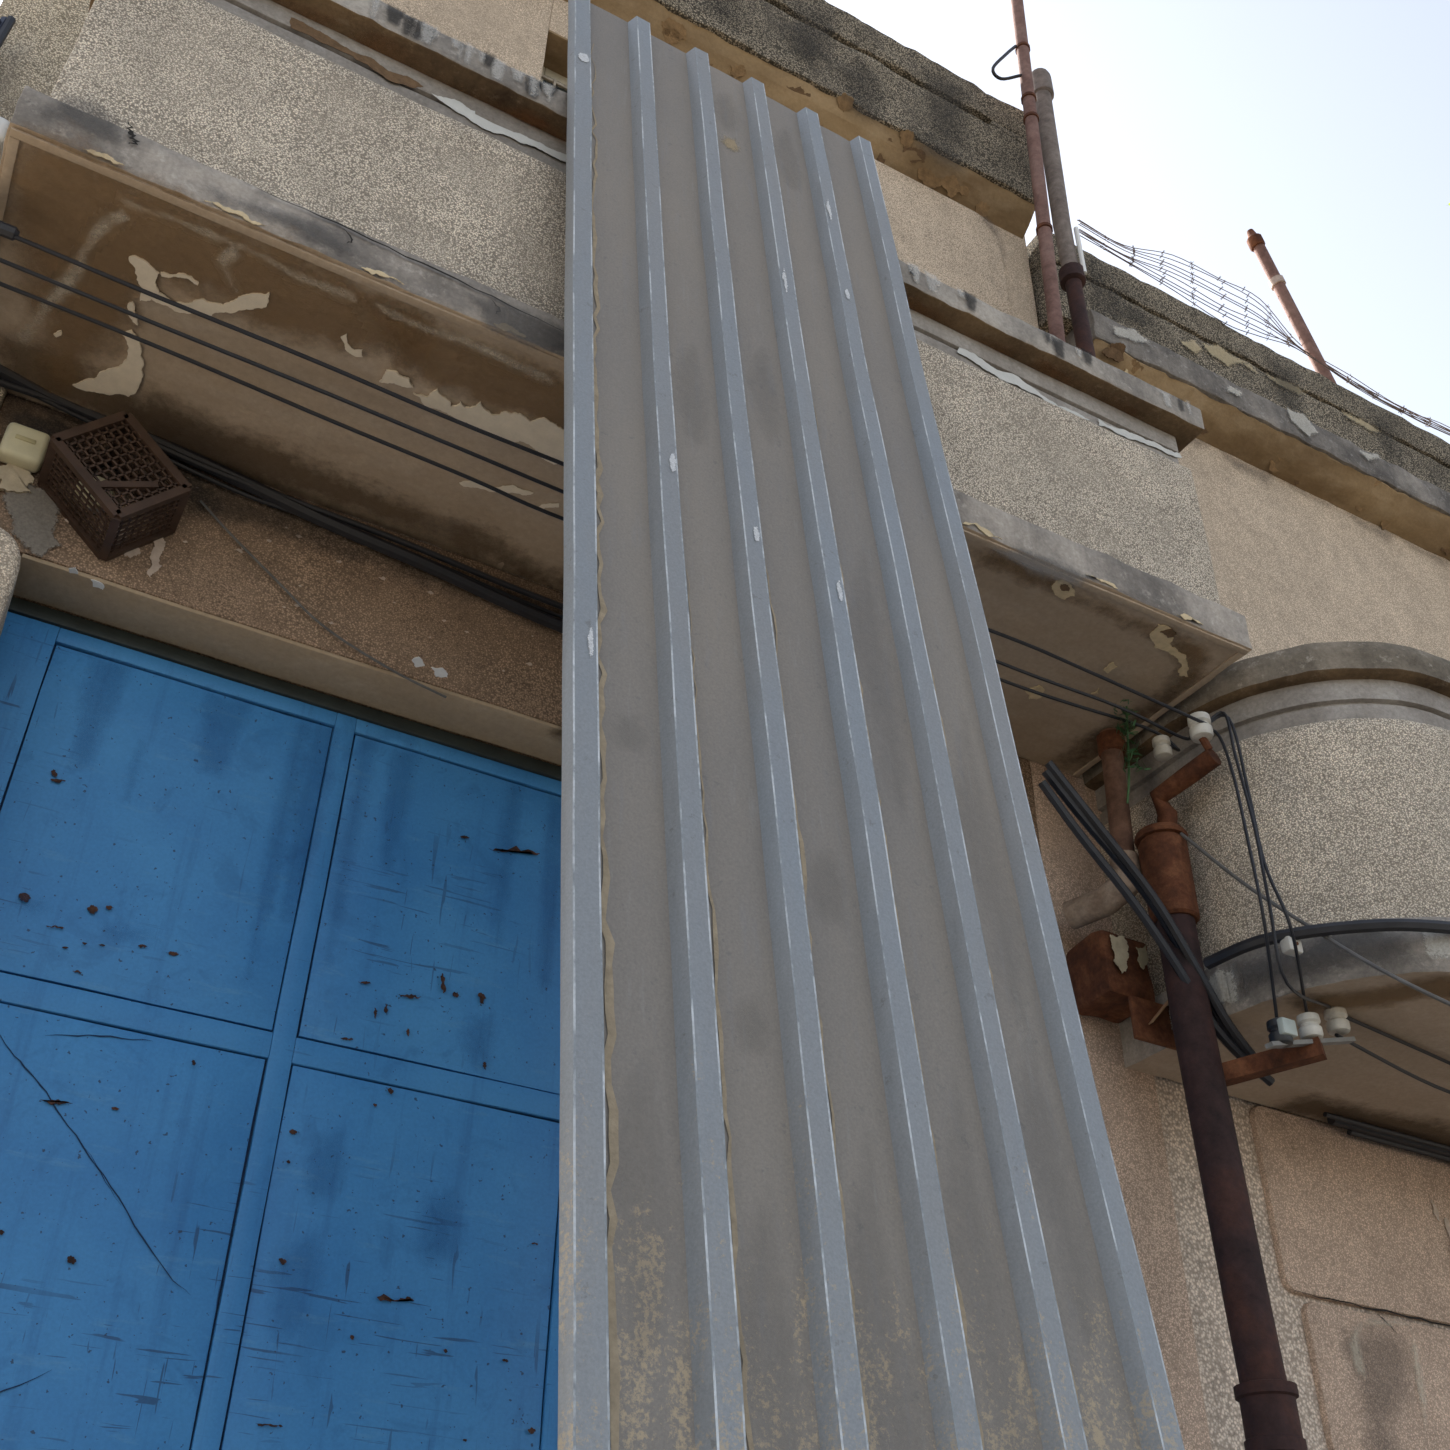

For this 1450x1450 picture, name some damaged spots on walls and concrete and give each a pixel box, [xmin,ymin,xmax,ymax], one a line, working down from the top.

leakage [57,98,118,135]
spalling [84,149,124,166]
spalling [204,200,265,226]
spalling [361,267,404,285]
peeling [73,255,270,397]
peeling [341,334,363,357]
leakage [0,150,564,585]
spalling [962,522,1001,539]
leakage [983,552,1082,589]
spalling [1052,575,1118,600]
spalling [1149,613,1203,677]